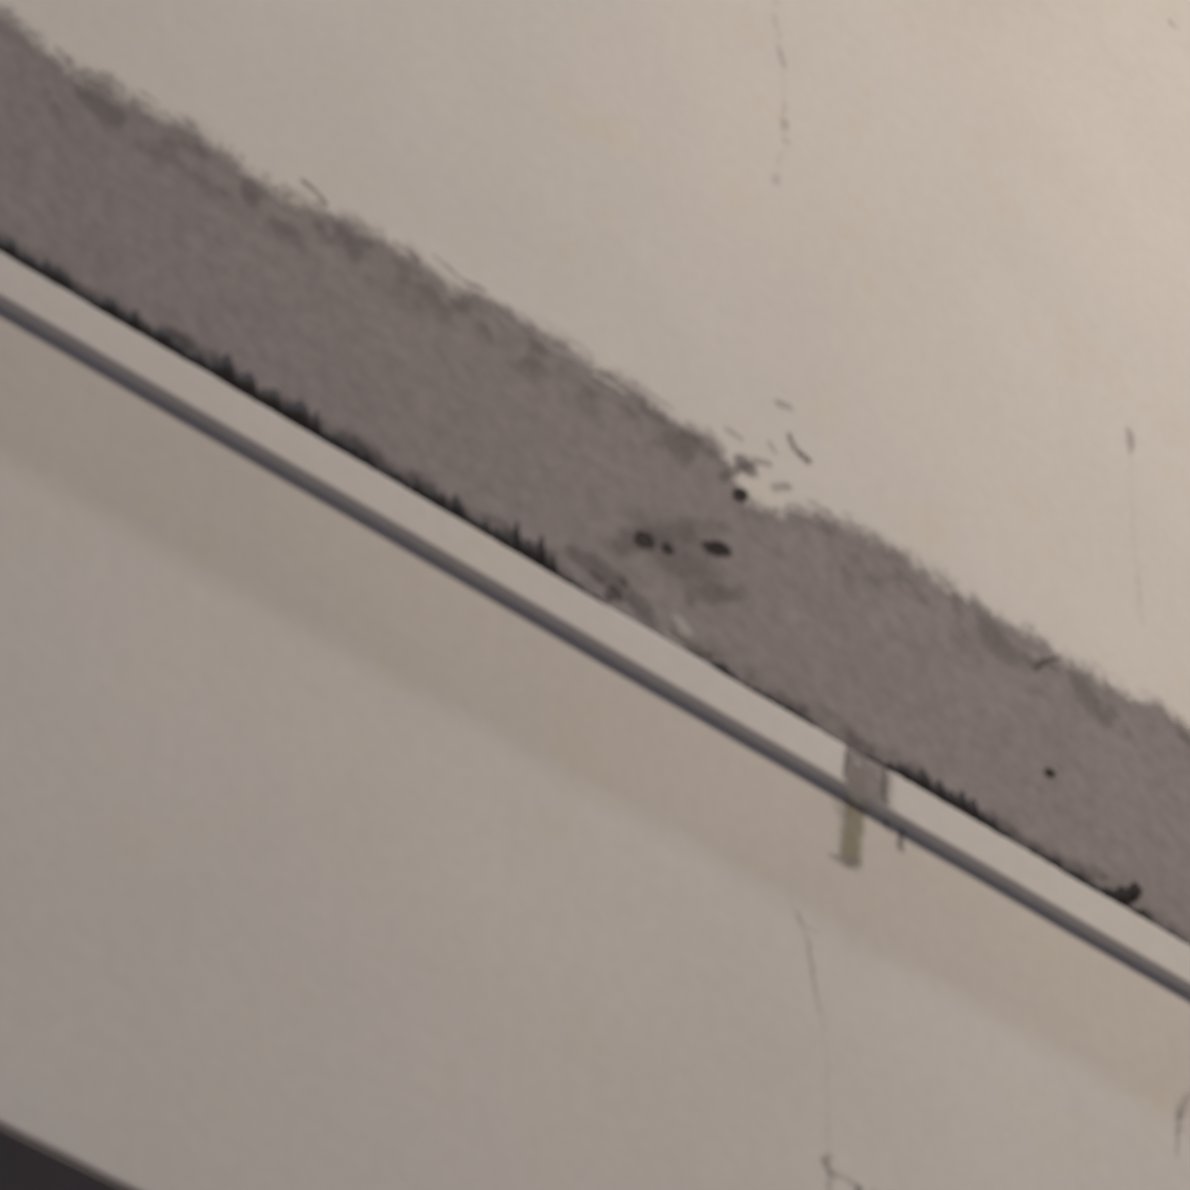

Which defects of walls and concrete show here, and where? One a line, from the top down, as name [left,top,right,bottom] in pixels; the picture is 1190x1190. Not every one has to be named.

peeling [0,9,1190,943]